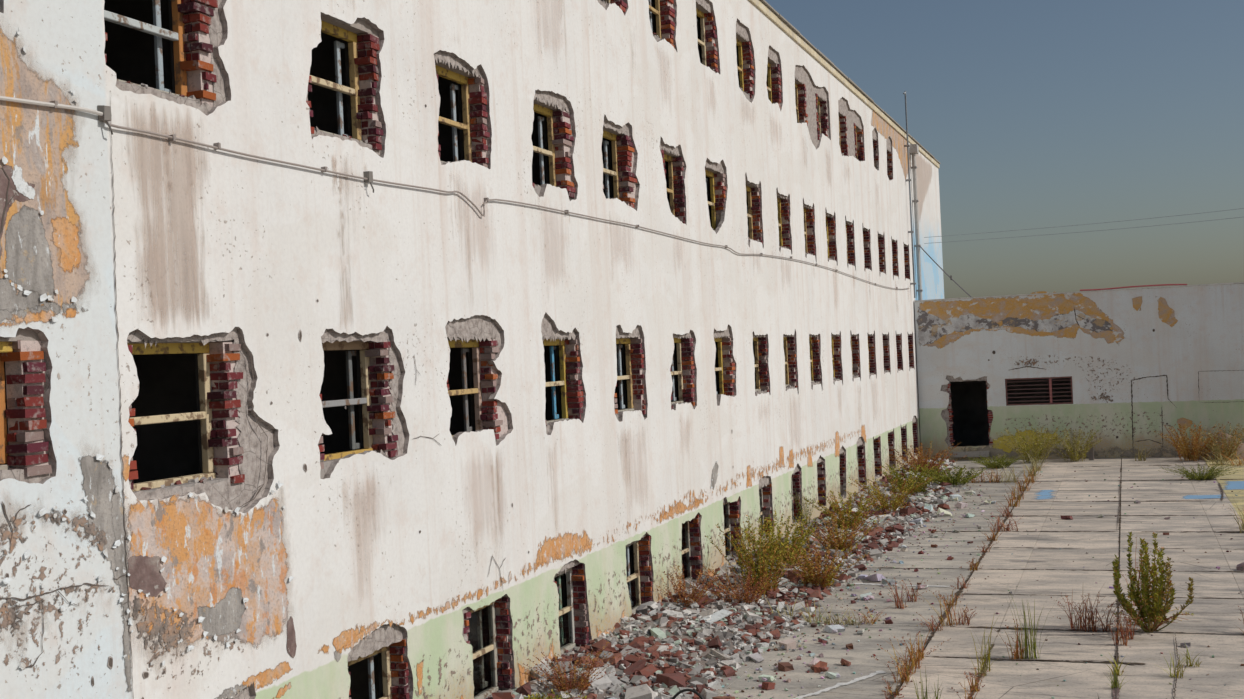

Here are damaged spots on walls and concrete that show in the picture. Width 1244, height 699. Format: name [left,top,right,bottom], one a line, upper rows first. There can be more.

peeling [0,28,90,483]
flaking render [753,335,769,396]
peeling [783,291,1124,389]
flaking render [940,351,1195,447]
peeling [1132,296,1178,332]
peeling [0,328,297,699]
flaking render [334,416,918,699]